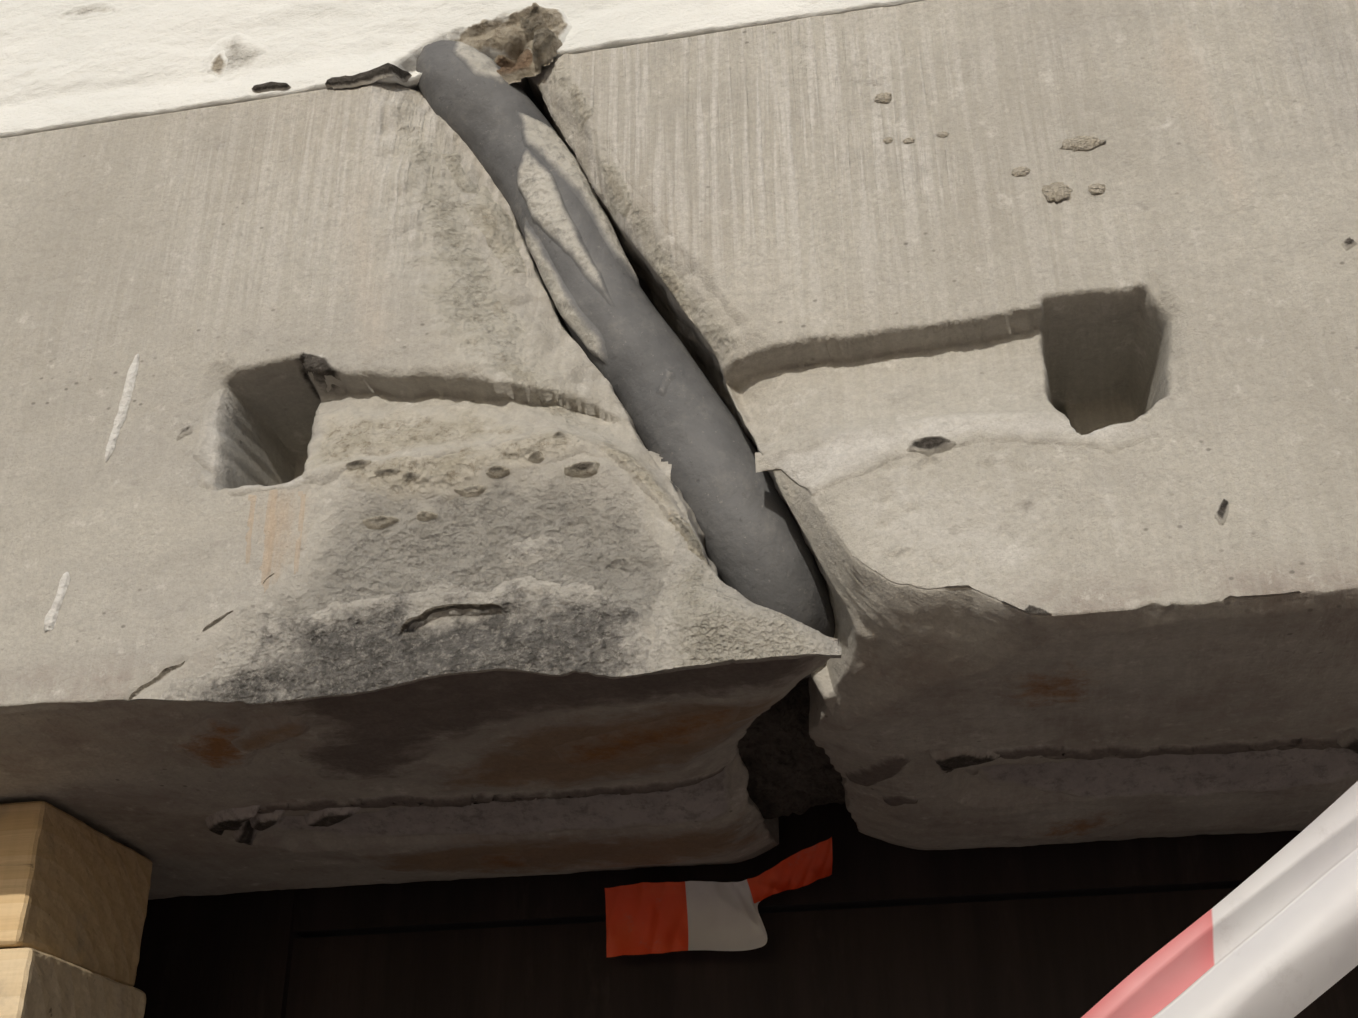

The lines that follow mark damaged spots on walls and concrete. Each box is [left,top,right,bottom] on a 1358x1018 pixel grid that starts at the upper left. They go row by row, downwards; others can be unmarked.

spalling [444,3,760,391]
spalling [100,83,710,705]
crack [257,765,727,814]
leakage [271,657,816,794]
crack [844,754,919,806]
crack [993,737,1342,760]